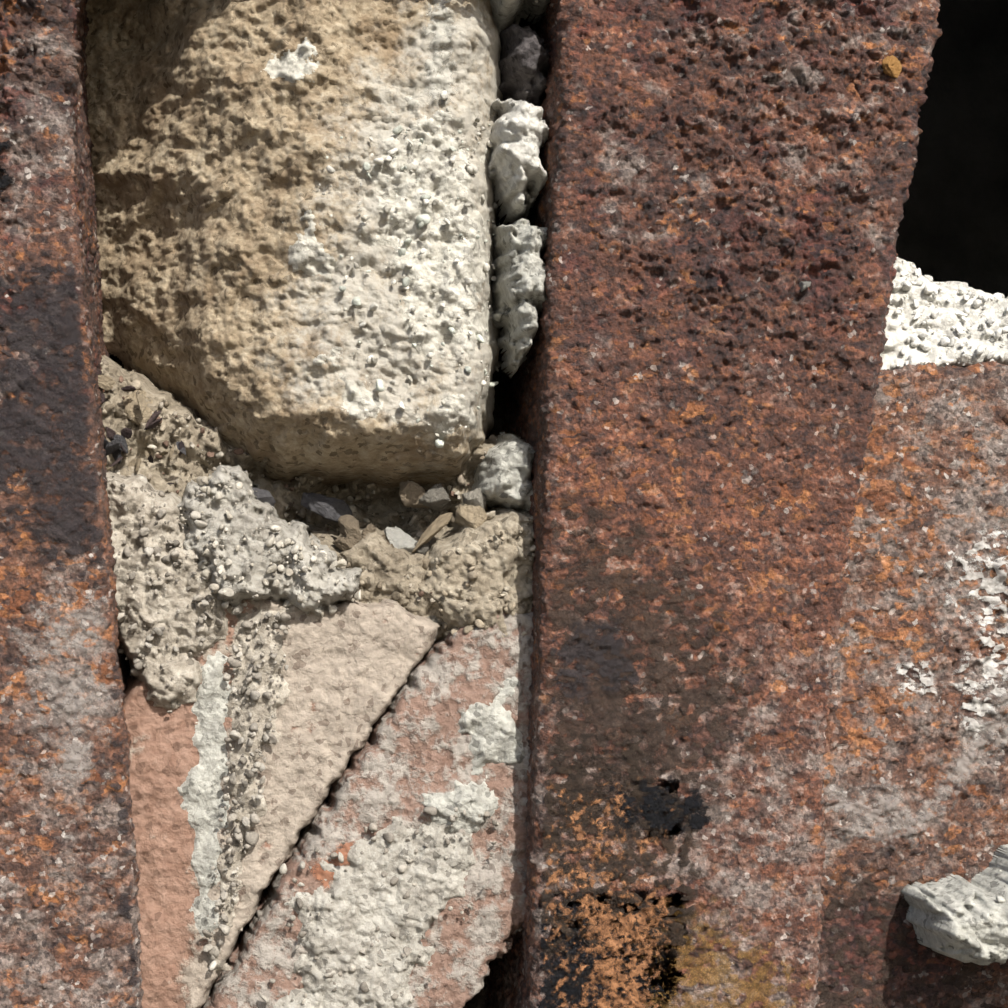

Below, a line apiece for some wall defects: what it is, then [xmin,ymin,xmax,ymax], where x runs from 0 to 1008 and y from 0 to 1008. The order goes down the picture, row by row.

rust [882,55,902,78]
peeling [421,676,525,834]
peeling [539,728,711,1008]
rust [816,868,1000,1008]